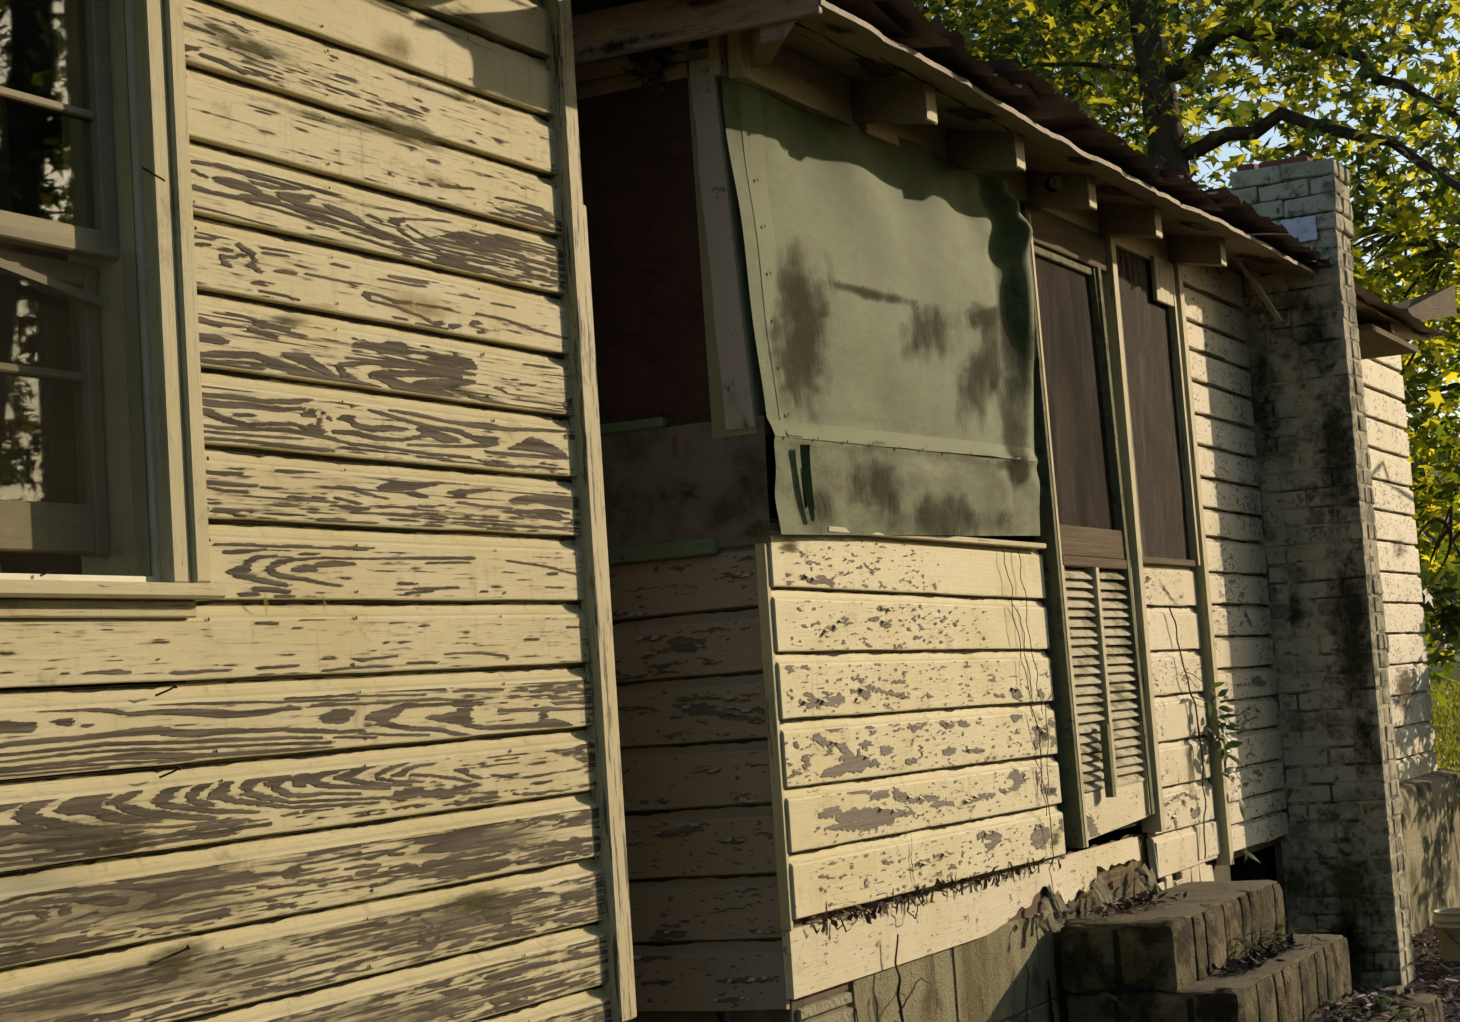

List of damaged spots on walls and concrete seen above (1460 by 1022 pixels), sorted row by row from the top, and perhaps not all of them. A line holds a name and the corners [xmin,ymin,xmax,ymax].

peeling [183,7,510,144]
peeling [190,145,566,289]
peeling [194,231,568,339]
peeling [198,311,575,474]
peeling [206,467,581,533]
peeling [214,543,583,597]
peeling [257,622,509,675]
peeling [0,680,593,777]
peeling [779,535,1064,907]
peeling [0,743,597,869]
peeling [0,808,601,966]
peeling [0,873,612,1022]